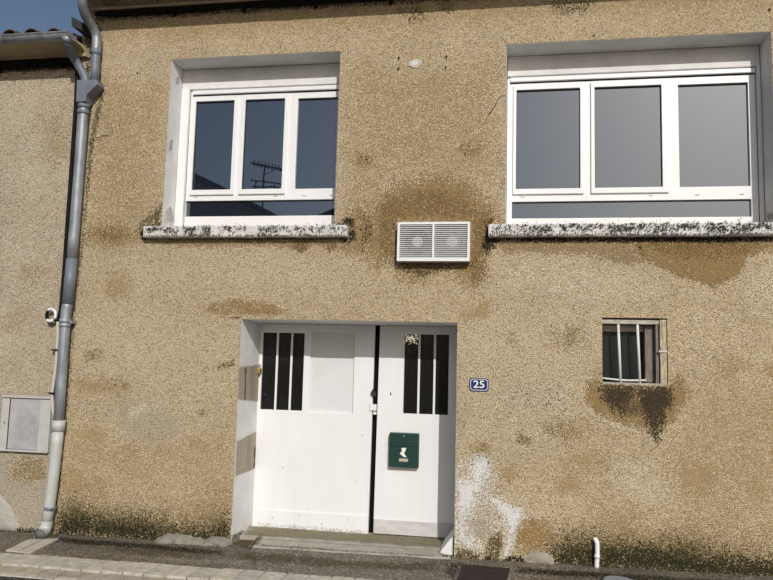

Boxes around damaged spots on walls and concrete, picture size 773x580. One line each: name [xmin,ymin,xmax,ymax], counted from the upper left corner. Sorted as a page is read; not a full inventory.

leakage [81,46,773,325]
leakage [69,345,142,398]
leakage [545,320,594,357]
leakage [52,405,234,540]
leakage [454,437,531,561]
leakage [515,347,773,577]